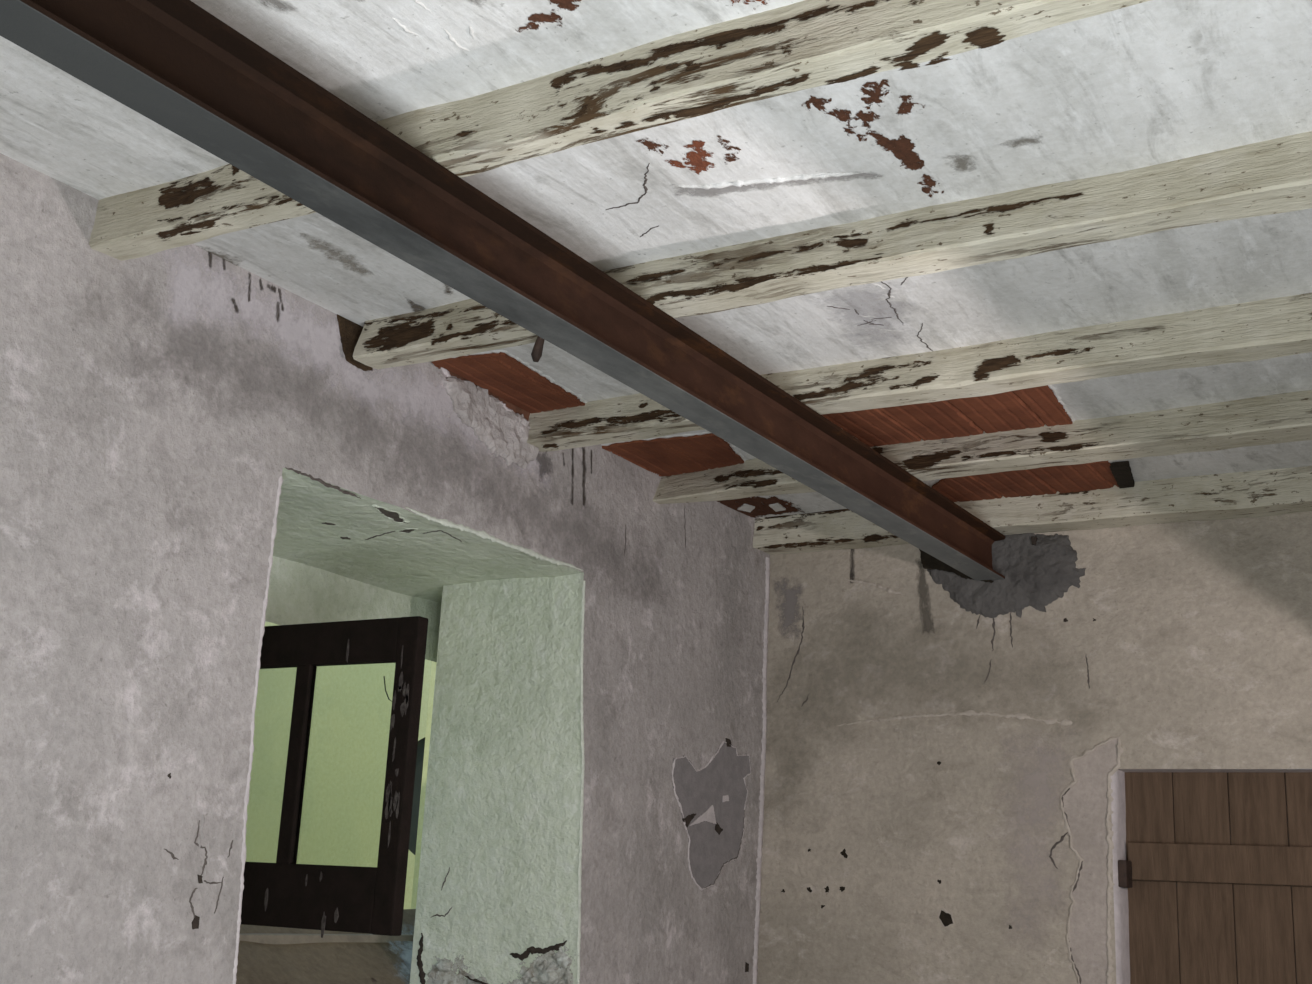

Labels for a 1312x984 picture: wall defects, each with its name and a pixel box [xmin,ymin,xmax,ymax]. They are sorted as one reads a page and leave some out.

crack [392,0,475,52]
peeling [516,0,581,33]
peeling [548,0,918,120]
peeling [590,27,1006,198]
peeling [156,165,306,241]
crack [606,163,659,237]
peeling [886,192,1083,235]
crack [827,277,933,351]
peeling [793,357,940,400]
flaking render [337,306,899,549]
flaking render [822,347,1135,502]
crack [165,814,233,929]